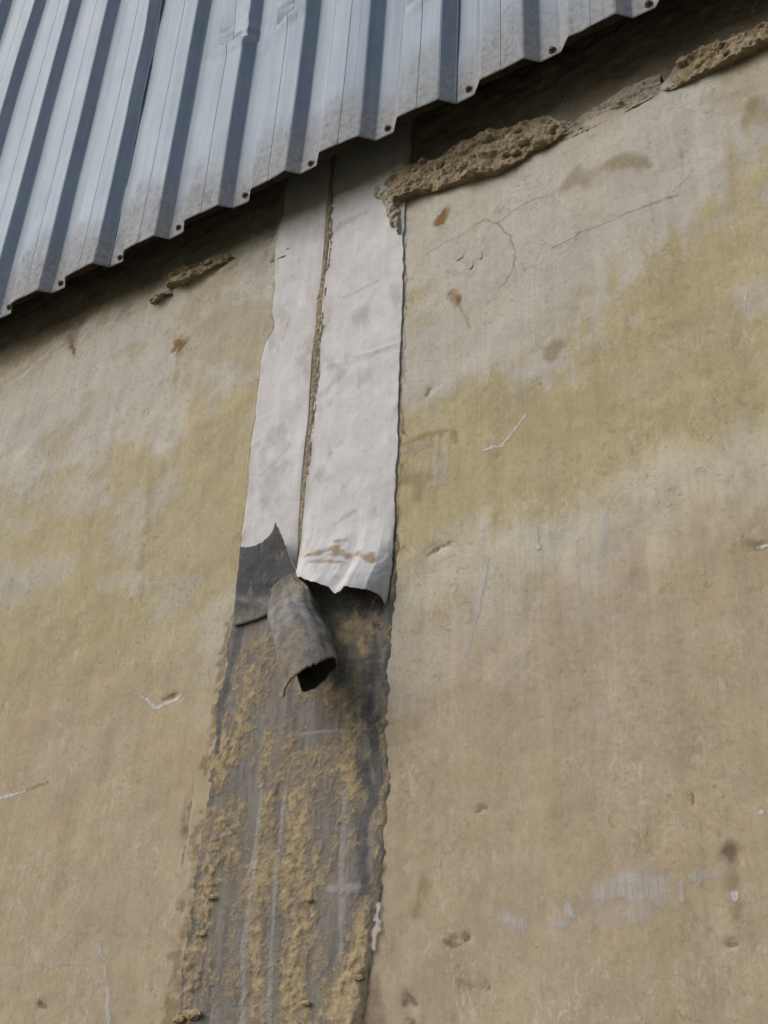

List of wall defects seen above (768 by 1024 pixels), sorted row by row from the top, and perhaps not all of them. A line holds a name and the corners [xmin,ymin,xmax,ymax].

rust [435,210,449,226]
spalling [148,253,236,304]
peeling [163,20,768,1024]
rust [305,540,375,563]